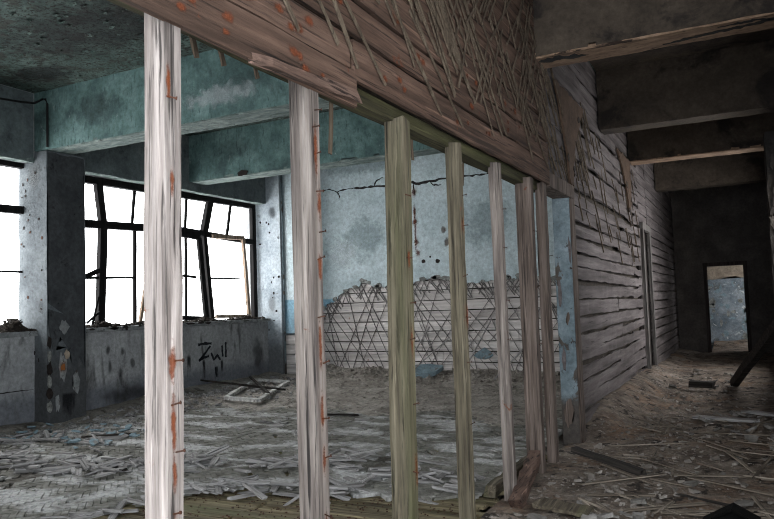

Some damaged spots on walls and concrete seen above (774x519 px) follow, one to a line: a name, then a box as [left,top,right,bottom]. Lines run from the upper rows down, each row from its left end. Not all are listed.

crack [324,177,385,198]
crack [411,173,488,194]
corrosion [168,347,176,382]
spalling [324,278,389,369]
spalling [413,275,453,371]
spalling [467,279,498,370]
spalling [506,273,523,371]
peeling [551,275,579,434]